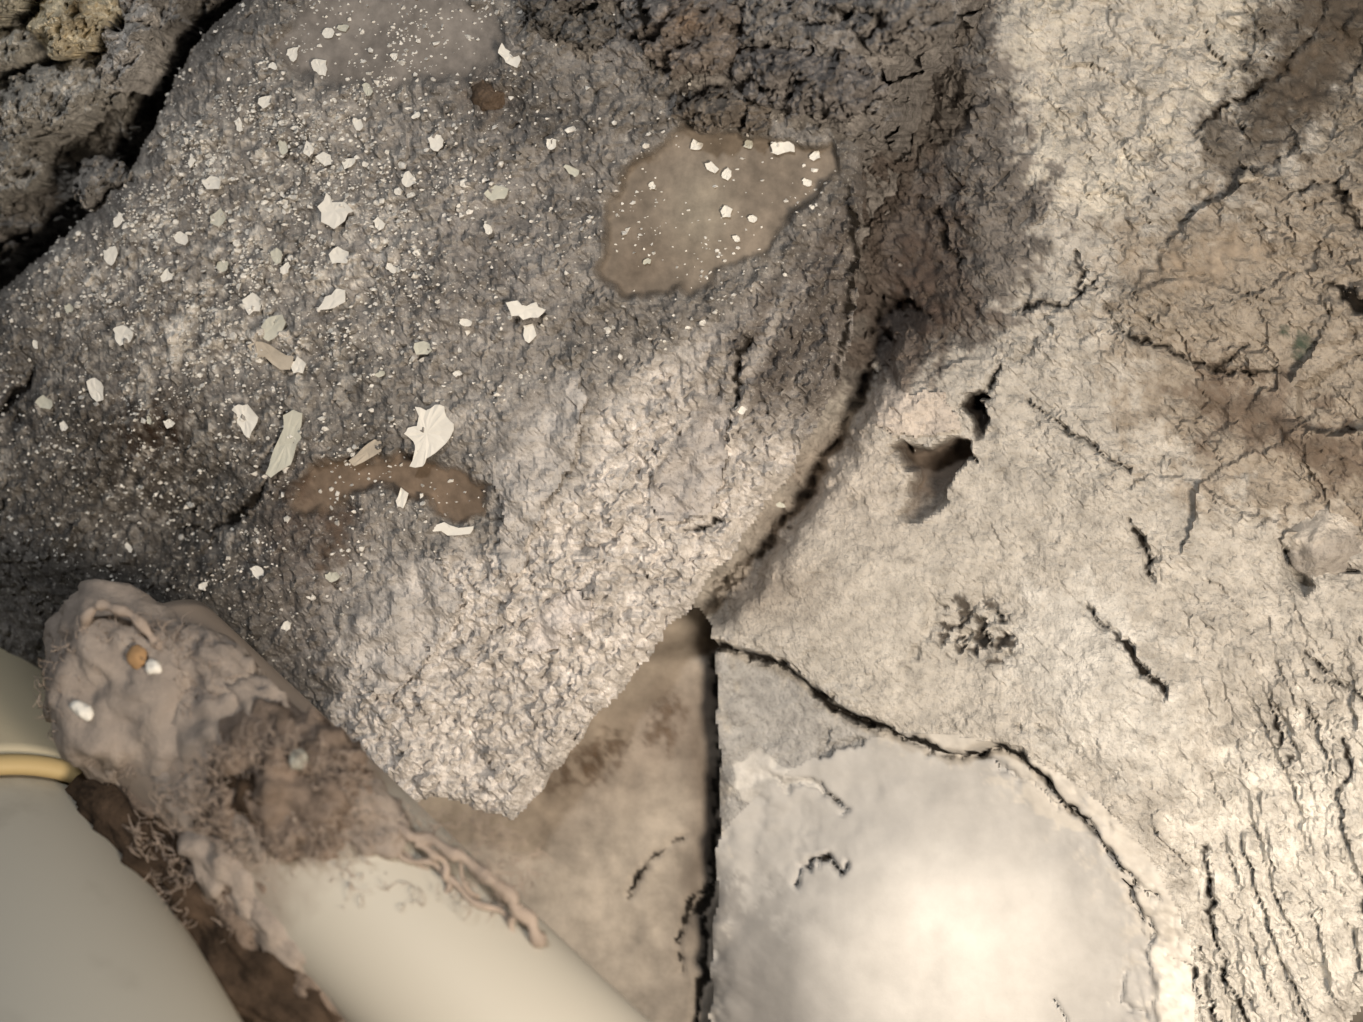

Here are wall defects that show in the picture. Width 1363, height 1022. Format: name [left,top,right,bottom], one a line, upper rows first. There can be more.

spalling [596,120,840,298]
crack [1023,251,1092,311]
crack [1327,282,1363,314]
crack [1114,323,1275,375]
peeling [292,370,587,582]
peeling [866,383,990,510]
crack [1130,519,1154,580]
crack [1087,606,1167,696]
crack [1268,702,1302,777]
crack [1339,738,1353,791]
crack [629,643,1156,1022]
crack [1189,845,1249,1022]